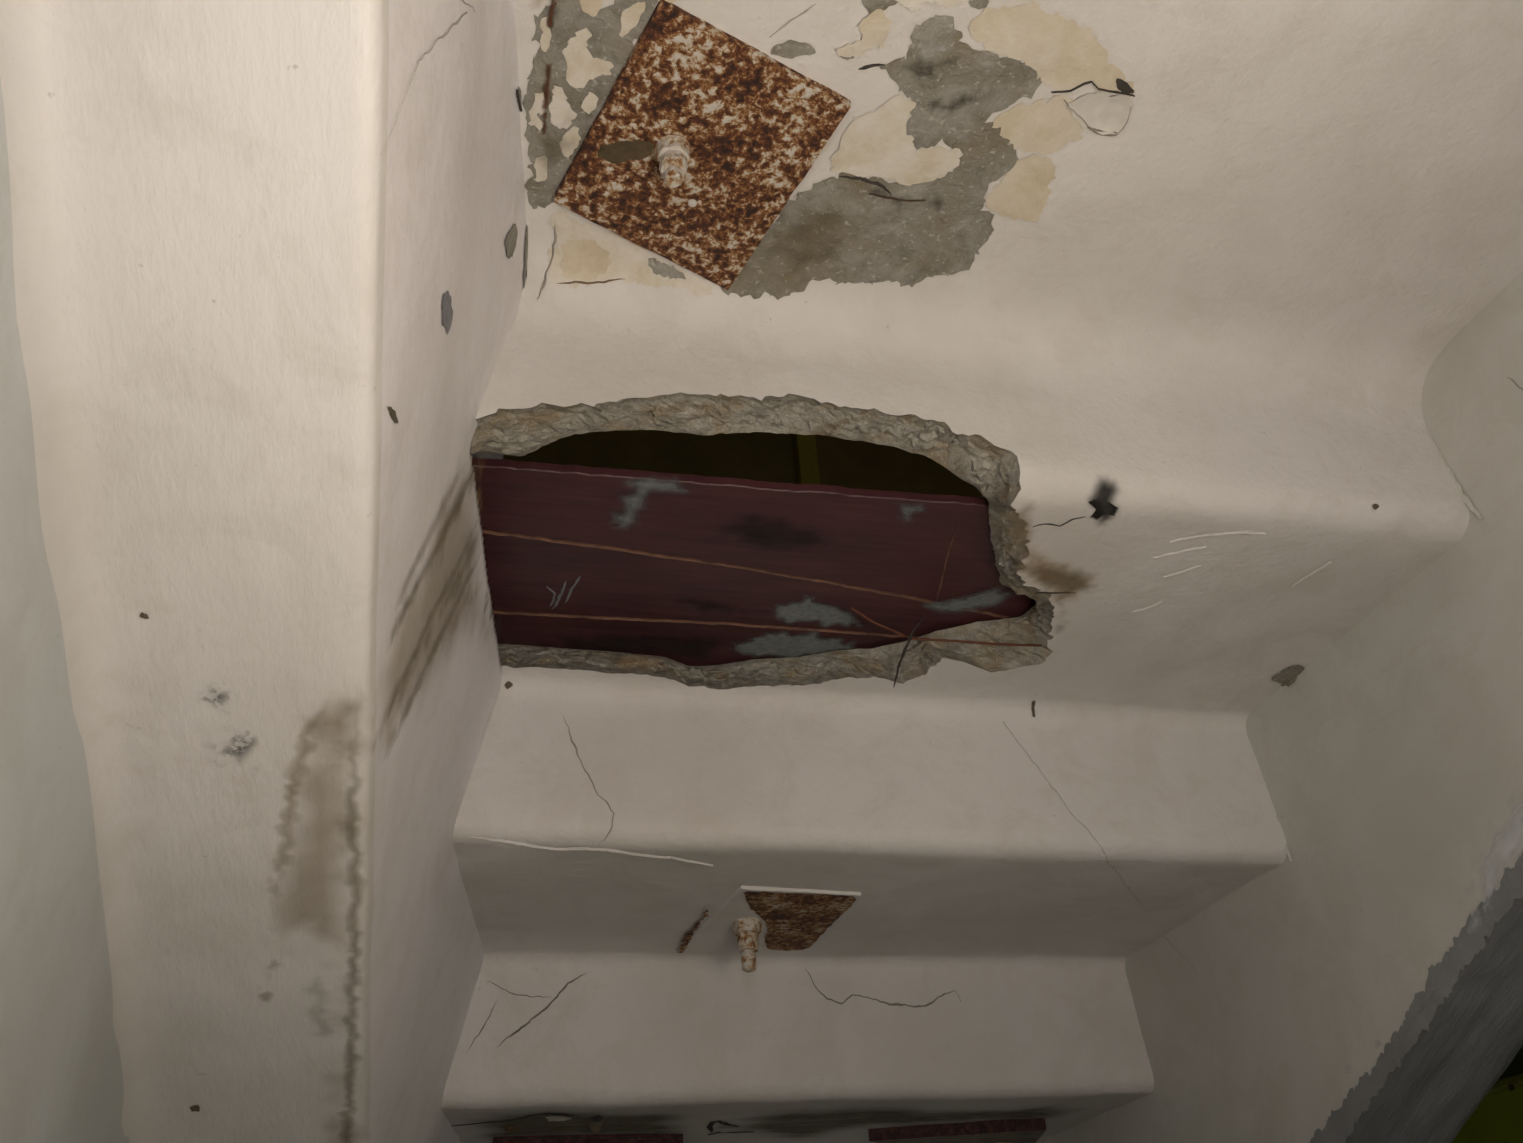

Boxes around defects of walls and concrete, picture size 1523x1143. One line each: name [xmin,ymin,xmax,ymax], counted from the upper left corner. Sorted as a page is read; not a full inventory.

rust [547,0,556,28]
rust [542,65,551,133]
peeling [505,0,1135,300]
spalling [471,392,1083,690]
crack [1033,517,1084,527]
crack [467,973,586,1052]
crack [805,968,961,1008]